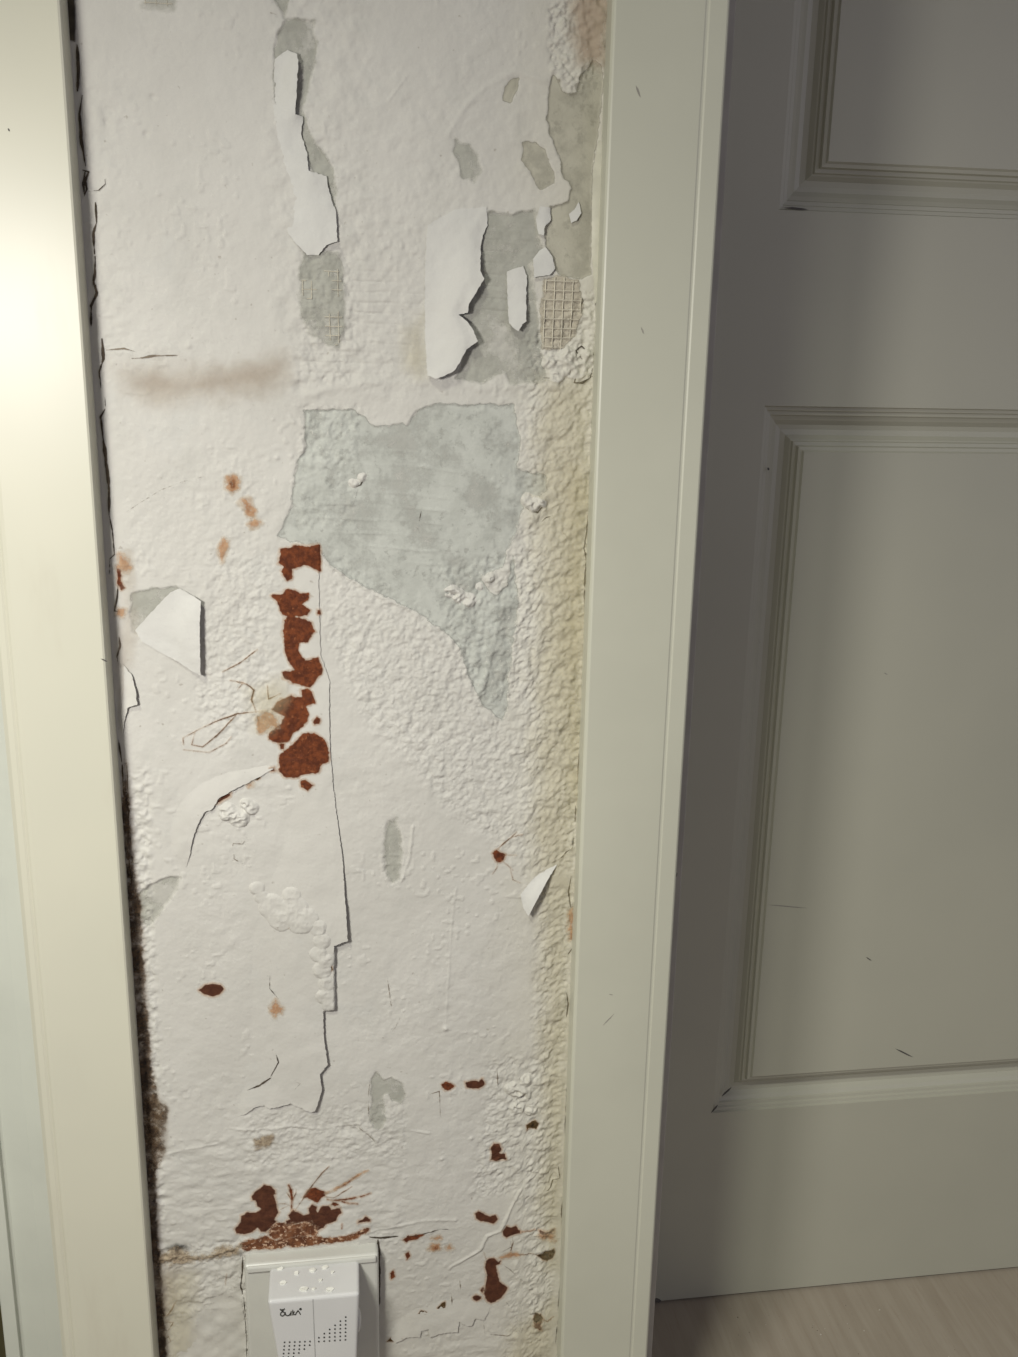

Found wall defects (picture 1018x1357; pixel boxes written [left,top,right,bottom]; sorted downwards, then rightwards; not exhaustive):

peeling [273,0,337,255]
peeling [424,61,604,384]
crack [76,45,121,665]
peeling [131,587,201,675]
corrosion [248,544,329,791]
crack [119,743,130,819]
spalling [237,403,547,1117]
corrosion [198,983,224,997]
corrosion [441,1078,485,1091]
corrosion [235,1168,371,1251]
corrosion [472,1211,555,1303]